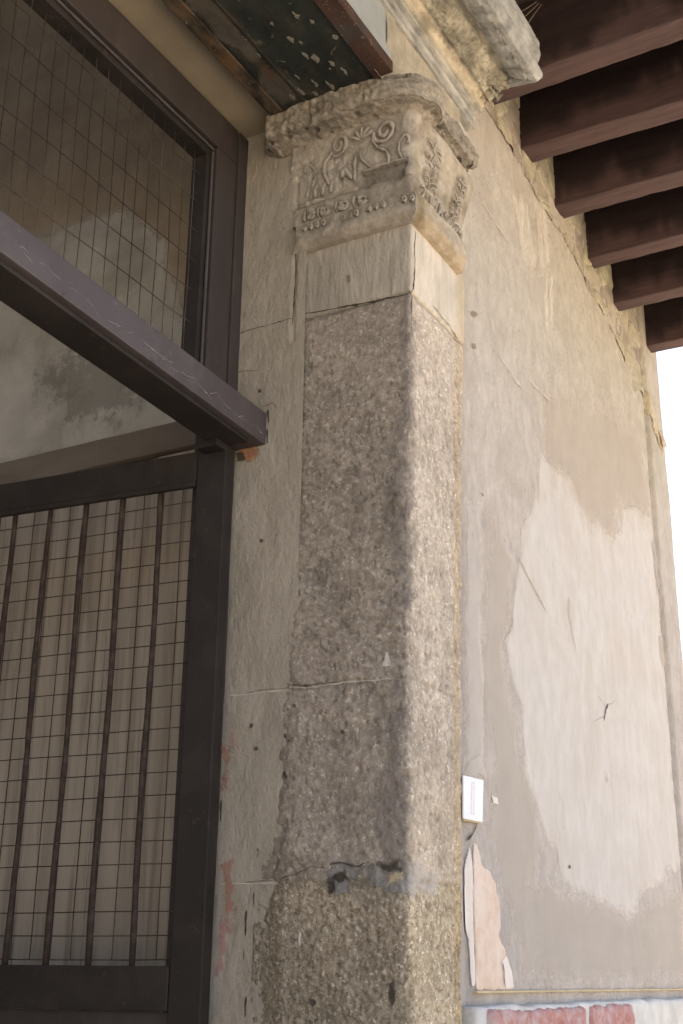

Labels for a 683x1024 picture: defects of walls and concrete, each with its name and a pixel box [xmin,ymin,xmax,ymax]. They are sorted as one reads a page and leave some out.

crack [230,678,403,696]
flaking render [506,457,682,913]
flaking render [464,824,514,990]